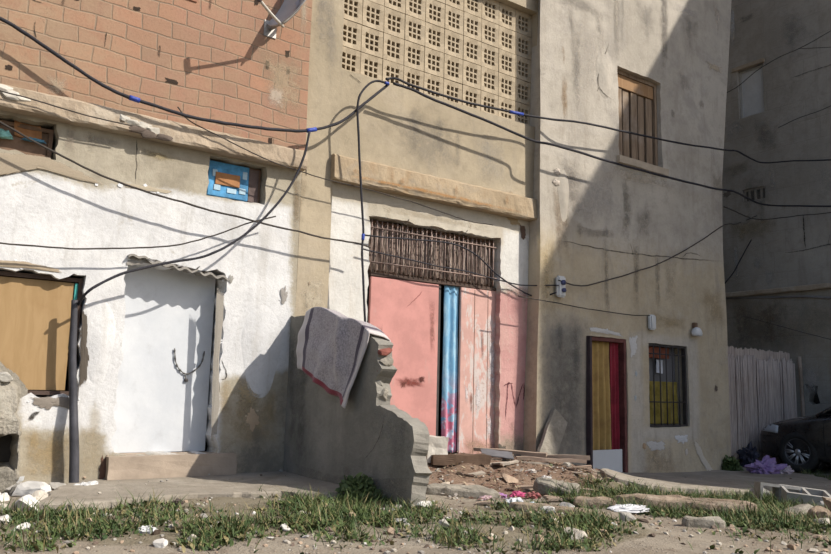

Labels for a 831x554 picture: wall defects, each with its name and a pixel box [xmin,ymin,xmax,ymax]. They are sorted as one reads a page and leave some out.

spalling [119,114,173,141]
peeling [0,153,99,186]
peeling [0,259,60,272]